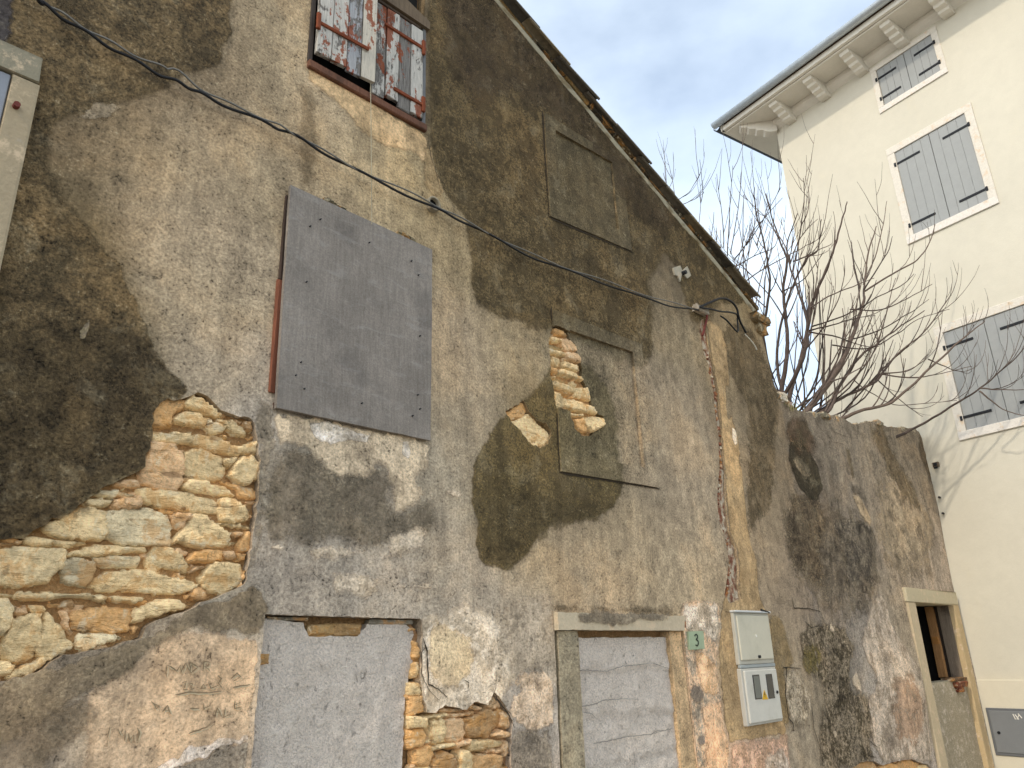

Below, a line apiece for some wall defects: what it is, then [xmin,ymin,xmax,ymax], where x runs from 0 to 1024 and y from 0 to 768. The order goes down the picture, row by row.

leakage [0,0,232,539]
leakage [309,0,744,359]
spalling [0,395,259,681]
leakage [250,401,434,566]
crack [421,638,469,699]
peeling [403,603,553,768]
crack [494,673,515,728]
spalling [506,402,549,447]
leakage [471,367,622,570]
spalling [549,328,606,436]
crack [699,319,738,603]
leakage [785,423,935,768]